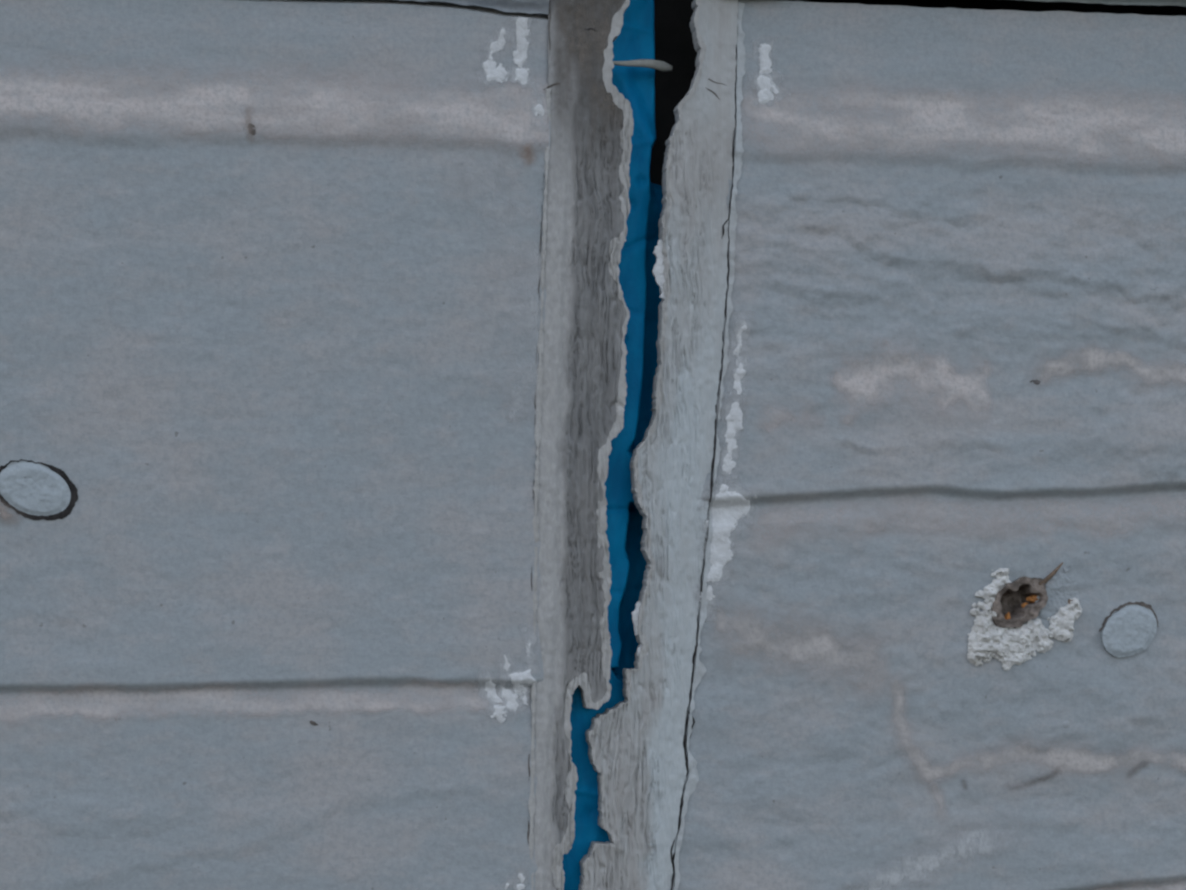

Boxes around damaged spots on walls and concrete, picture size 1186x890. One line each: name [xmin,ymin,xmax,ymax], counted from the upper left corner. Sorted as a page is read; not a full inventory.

crack [527,0,746,890]
spalling [991,565,1080,628]